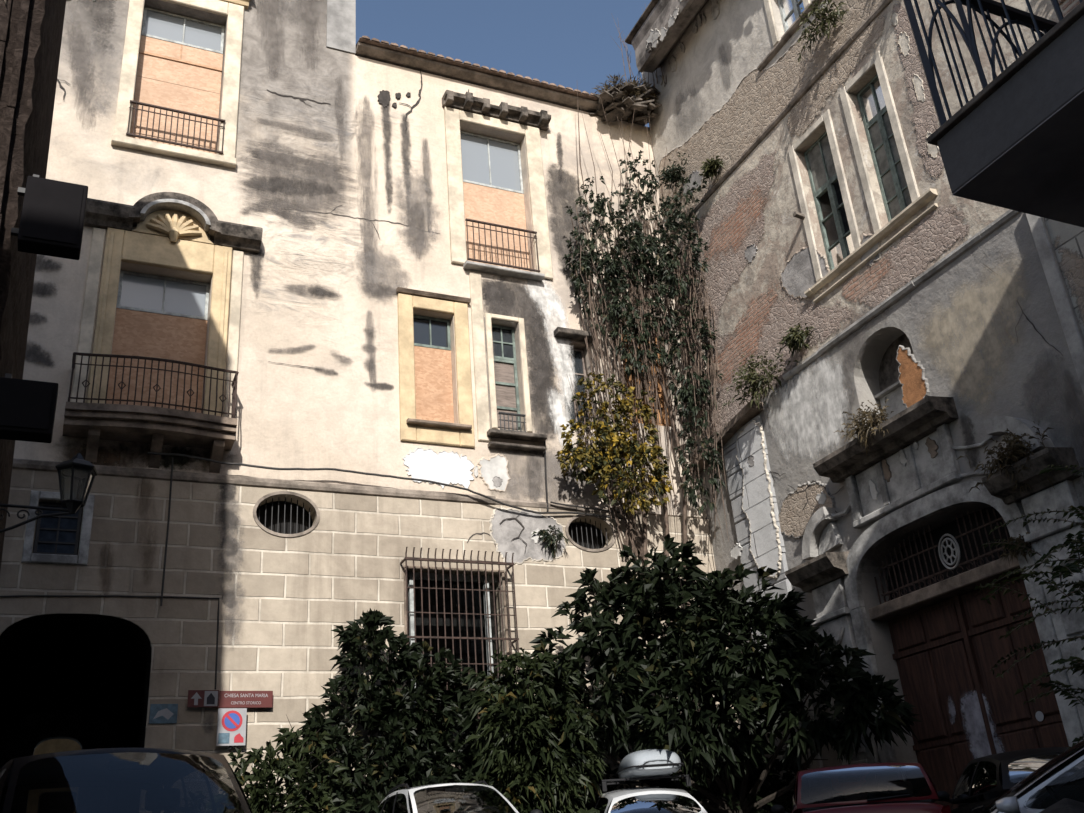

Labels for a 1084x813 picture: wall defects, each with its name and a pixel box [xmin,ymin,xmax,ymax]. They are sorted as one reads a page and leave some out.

peeling [646,0,721,86]
water stain [243,82,437,299]
flaking render [658,0,970,438]
water stain [270,345,314,353]
water stain [363,311,393,389]
water stain [527,279,574,445]
crack [983,264,1063,356]
water stain [219,484,242,636]
flaking render [474,454,511,492]
flaking render [489,508,566,565]
water stain [503,451,586,502]
peeling [730,420,835,579]